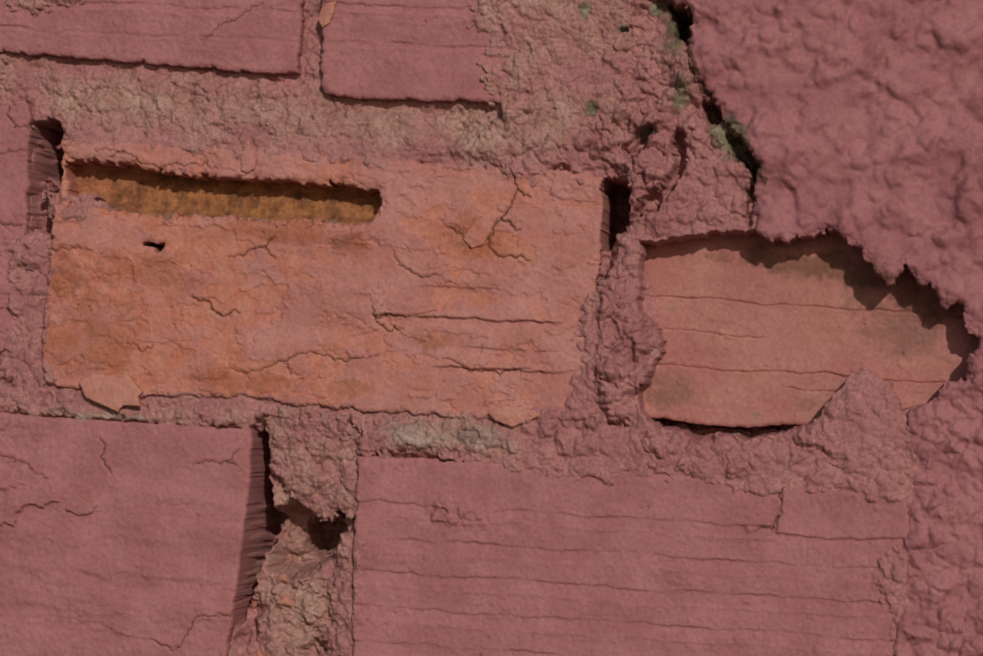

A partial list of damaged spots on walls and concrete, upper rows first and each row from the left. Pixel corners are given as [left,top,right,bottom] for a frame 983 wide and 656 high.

spalling [318,2,337,28]
crack [687,23,768,218]
spalling [75,163,382,228]
crack [447,158,531,261]
peeling [463,211,497,249]
crack [228,237,276,259]
crack [393,252,442,278]
crack [194,298,240,317]
crack [371,305,400,332]
crack [226,352,378,374]
crack [443,358,524,375]
spalling [488,405,541,427]